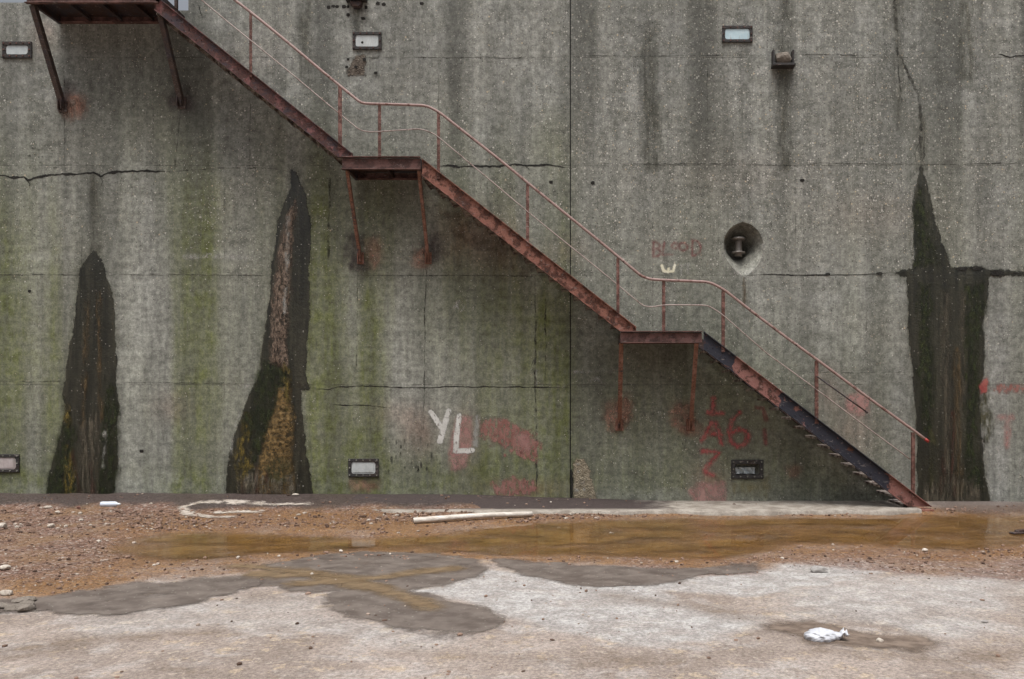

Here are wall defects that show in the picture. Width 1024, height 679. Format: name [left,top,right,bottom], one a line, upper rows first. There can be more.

crack [0,111,206,186]
spalling [345,54,377,76]
crack [441,162,584,170]
crack [752,0,1015,166]
damp [47,251,121,494]
damp [179,170,313,518]
crack [324,271,559,487]
crack [756,271,868,279]
damp [896,158,1024,502]
spalling [569,459,597,499]